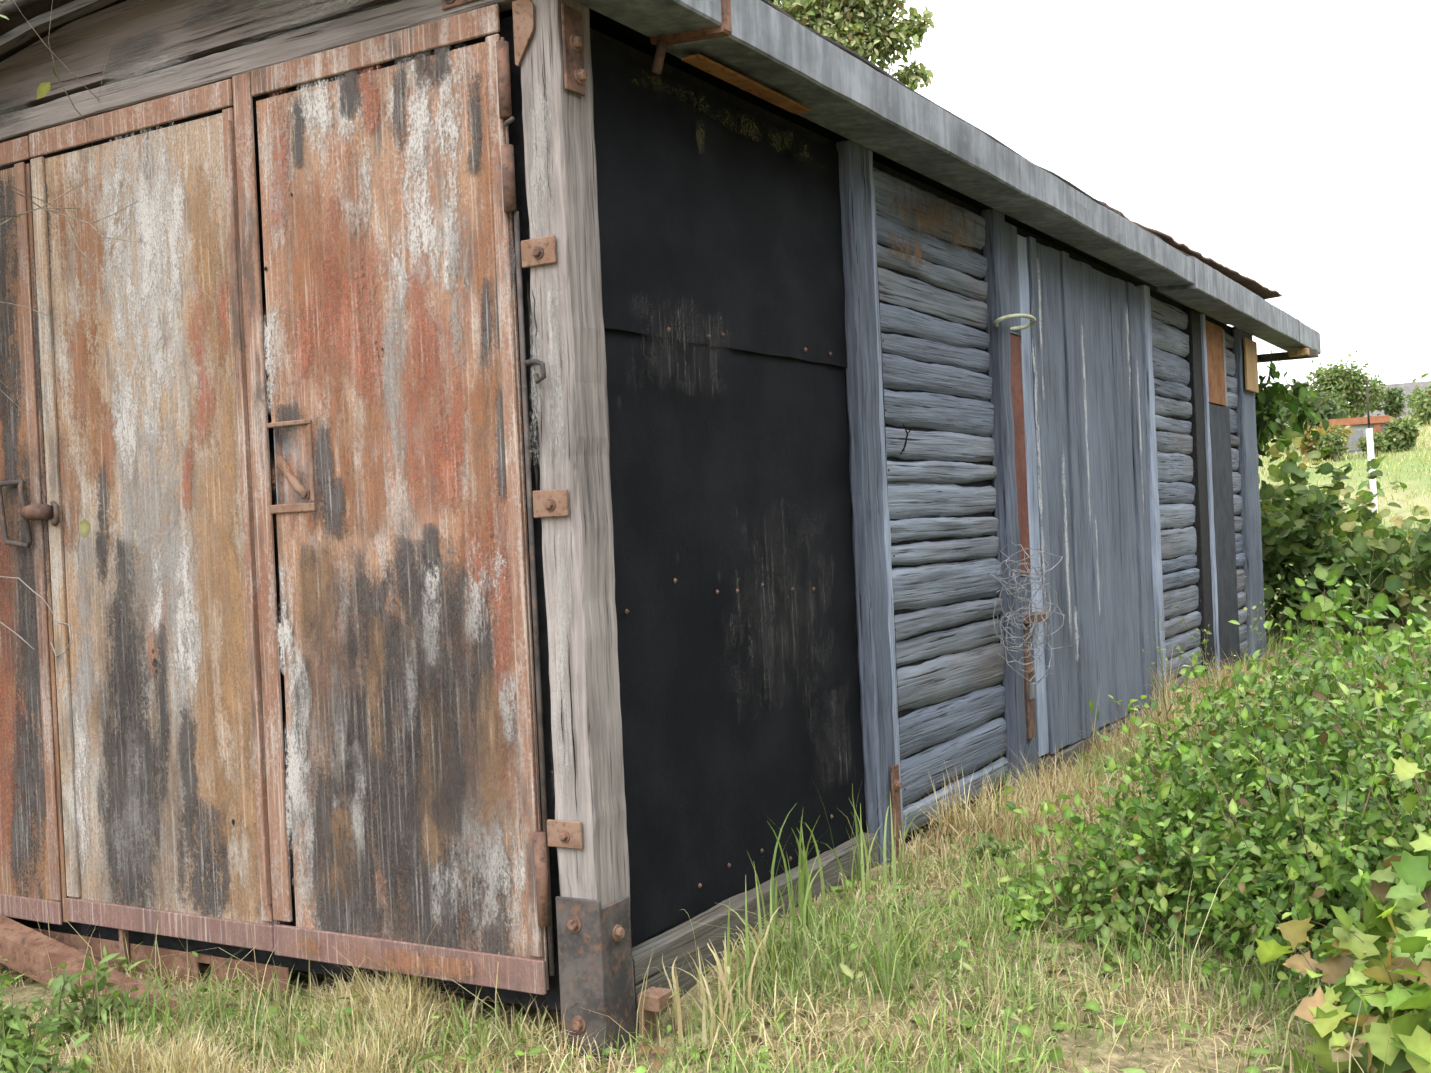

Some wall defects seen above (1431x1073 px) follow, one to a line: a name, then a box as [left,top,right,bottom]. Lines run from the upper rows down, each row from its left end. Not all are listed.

peeling [271,74,372,246]
rust [0,396,13,596]
peeling [102,129,201,802]
peeling [264,307,280,408]
rust [270,65,516,820]
peeling [371,49,469,553]
peeling [74,509,94,875]
peeling [403,567,441,731]
peeling [464,542,506,641]
rust [419,700,449,864]
peeling [432,804,525,927]
rust [343,945,475,980]